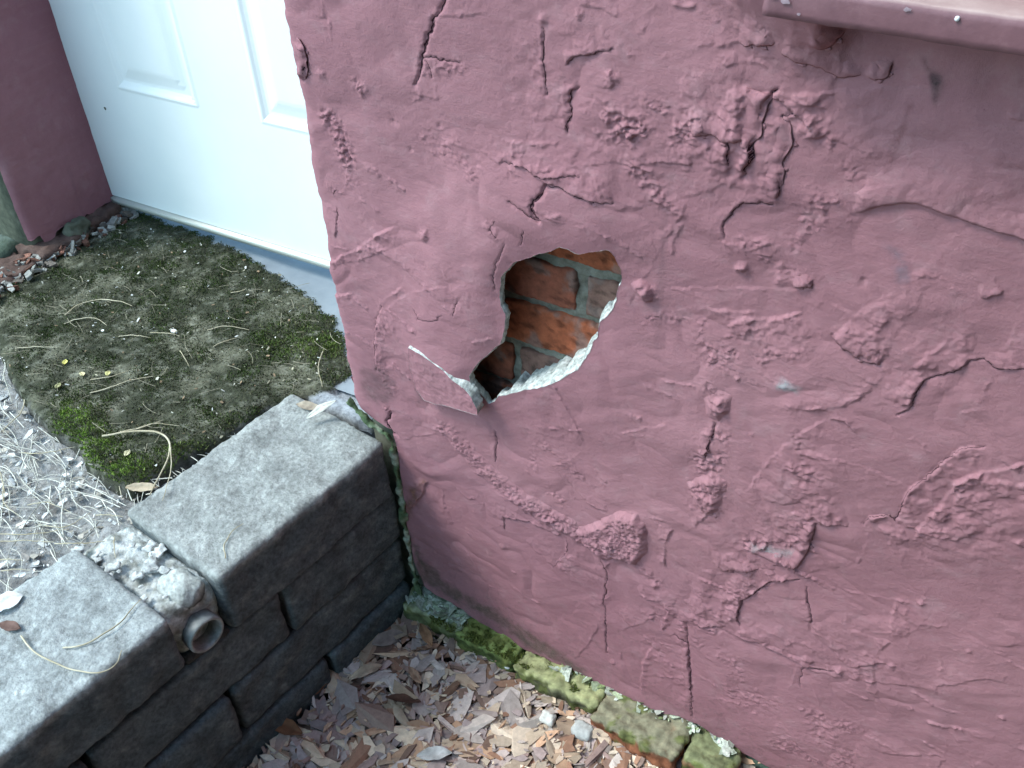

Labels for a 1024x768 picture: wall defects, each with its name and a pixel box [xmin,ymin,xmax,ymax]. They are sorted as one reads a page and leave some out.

crack [416,0,459,84]
crack [542,28,573,132]
crack [726,143,755,176]
crack [489,161,613,289]
spalling [408,247,622,415]
crack [676,633,693,710]